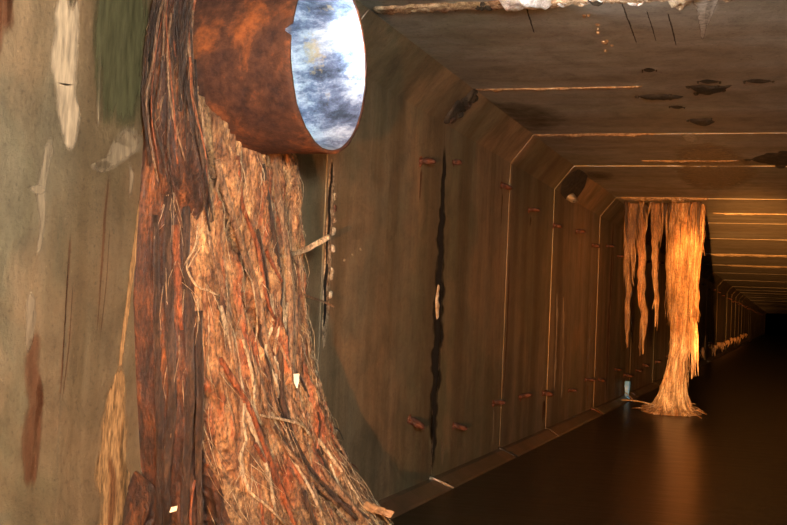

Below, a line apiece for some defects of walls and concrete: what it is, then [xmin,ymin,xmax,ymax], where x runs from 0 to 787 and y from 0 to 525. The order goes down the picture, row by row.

corrosion [0,0,13,40]
crack [622,4,676,44]
crack [429,152,454,489]